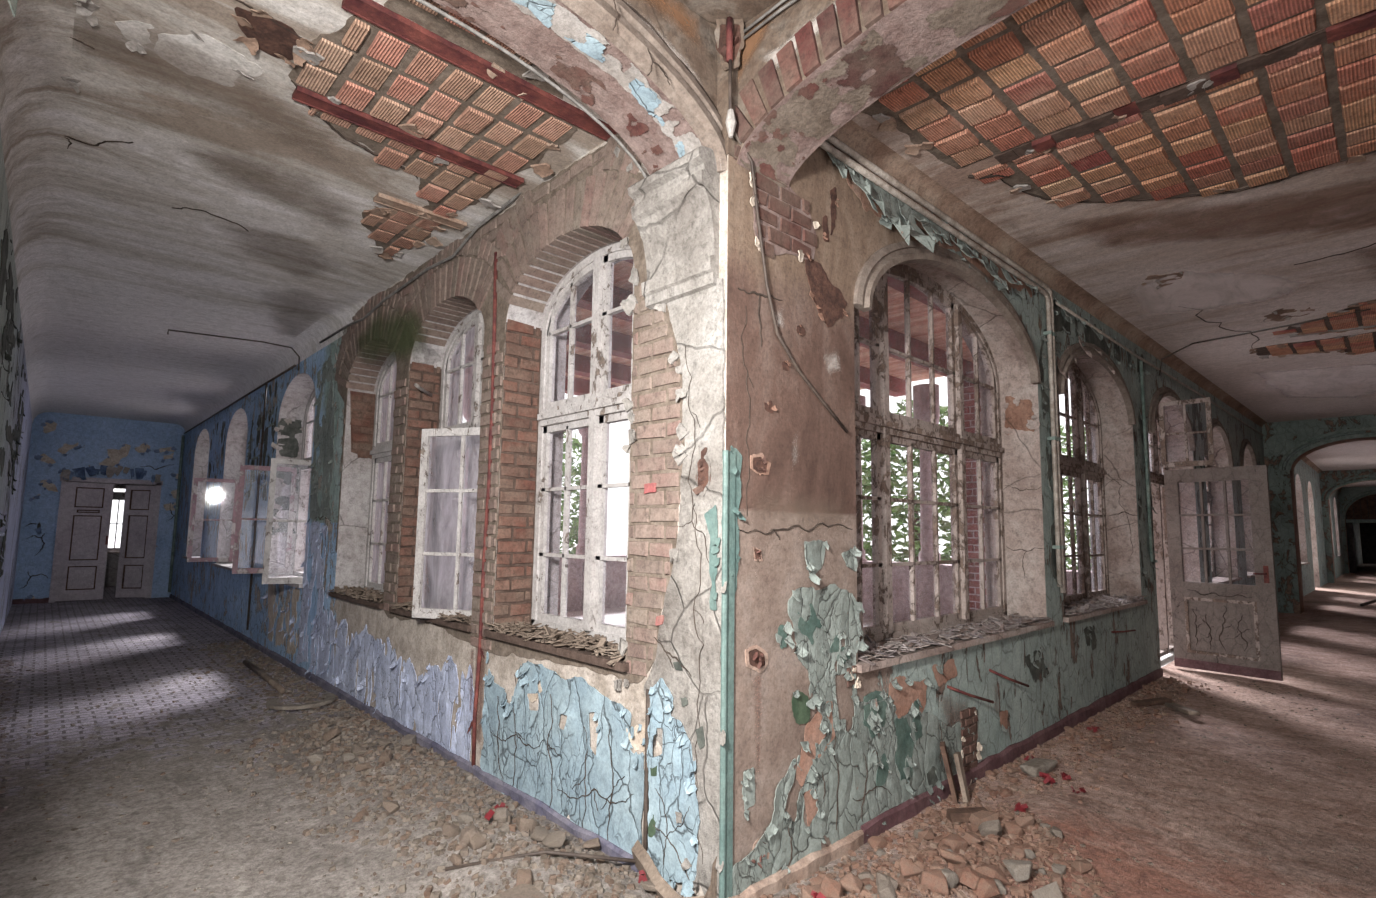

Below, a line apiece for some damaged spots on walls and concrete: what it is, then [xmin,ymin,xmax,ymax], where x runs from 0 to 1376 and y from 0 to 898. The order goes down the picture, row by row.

peeling [733,0,1376,328]
peeling [0,229,82,501]
flaking render [99,443,182,511]
peeling [206,421,225,506]
flaking render [231,0,771,897]
crack [467,346,709,879]
crack [738,288,850,540]
peeling [715,540,982,896]